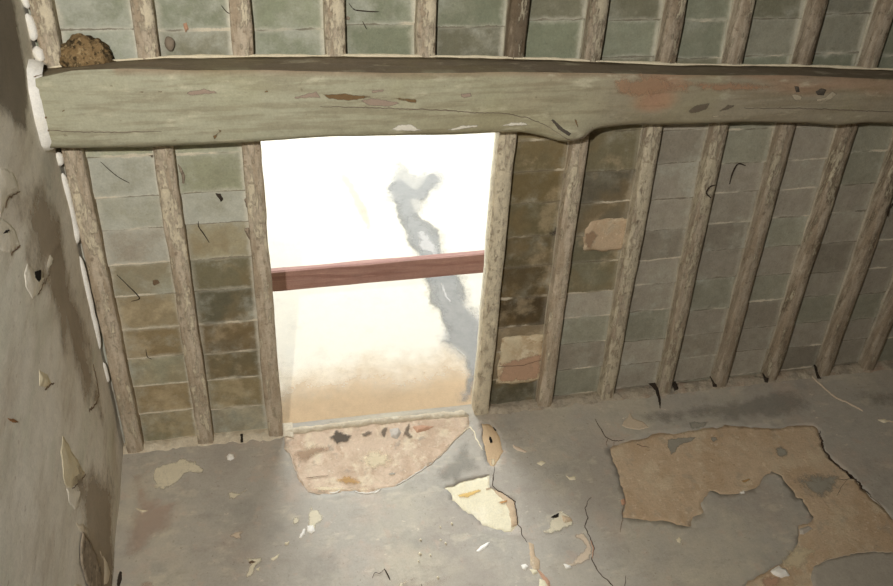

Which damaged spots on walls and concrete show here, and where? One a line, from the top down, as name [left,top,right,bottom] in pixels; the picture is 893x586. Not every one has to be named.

flaking render [0,168,21,256]
flaking render [24,255,53,299]
flaking render [583,217,627,252]
flaking render [496,334,543,385]
flaking render [284,410,527,532]
flaking render [610,413,893,586]
crack [819,431,885,510]
crack [584,501,626,586]